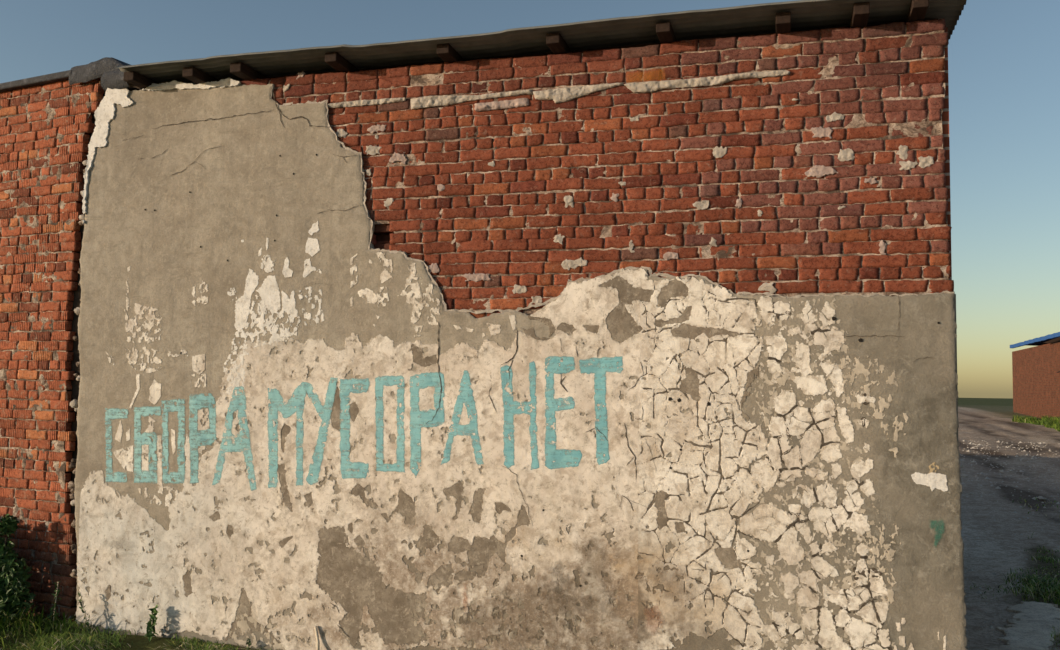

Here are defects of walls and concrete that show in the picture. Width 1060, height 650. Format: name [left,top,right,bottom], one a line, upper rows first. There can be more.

crack [126,88,330,175]
peeling [303,221,322,278]
peeling [124,266,208,408]
peeling [398,263,440,325]
crack [426,322,442,424]
crack [477,328,518,411]
peeling [599,276,654,343]
peeling [657,279,689,308]
peeling [655,306,741,340]
crack [587,268,904,650]
peeling [654,490,687,533]
peeling [316,526,430,647]